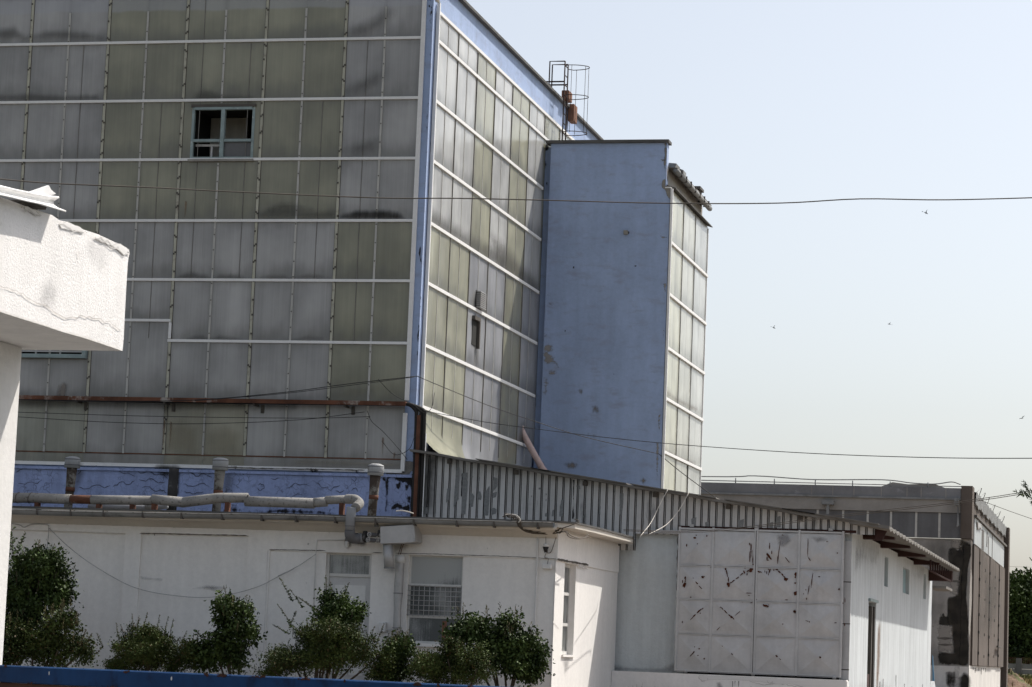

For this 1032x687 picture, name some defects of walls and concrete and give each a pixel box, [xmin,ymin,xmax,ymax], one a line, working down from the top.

rust [725,535,820,600]
leakage [938,541,986,687]